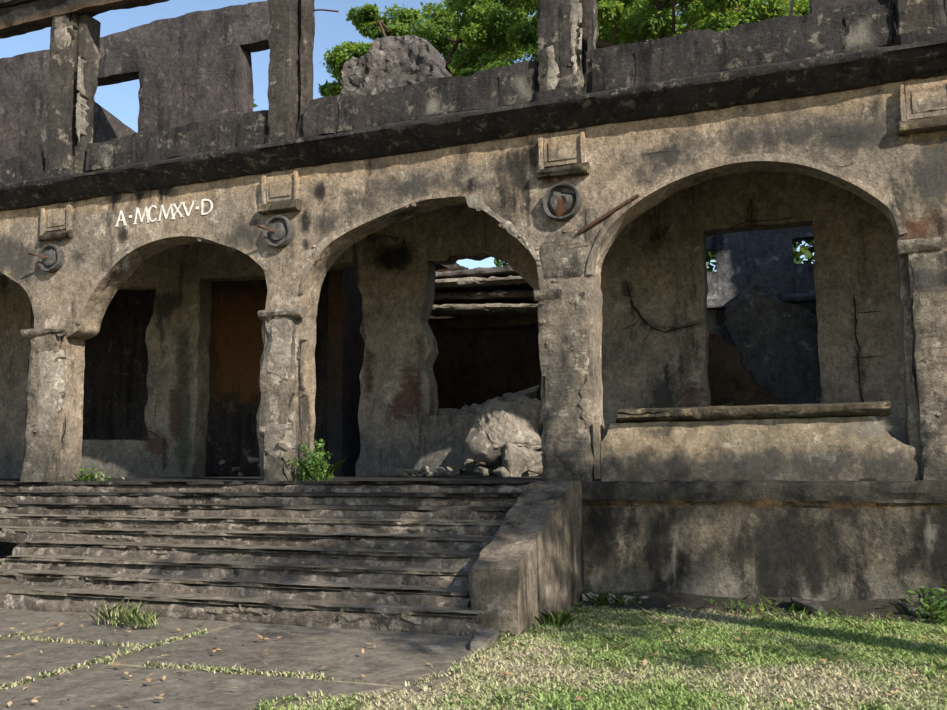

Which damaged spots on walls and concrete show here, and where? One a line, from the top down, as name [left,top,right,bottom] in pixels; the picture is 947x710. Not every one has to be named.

spalling [544,0,583,90]
leakage [299,173,486,249]
leakage [498,143,538,226]
leakage [0,236,36,281]
leakage [372,241,412,271]
crack [619,281,702,354]
crack [849,293,880,402]
crack [910,261,923,402]
leakage [732,514,837,596]
leakage [923,504,947,589]